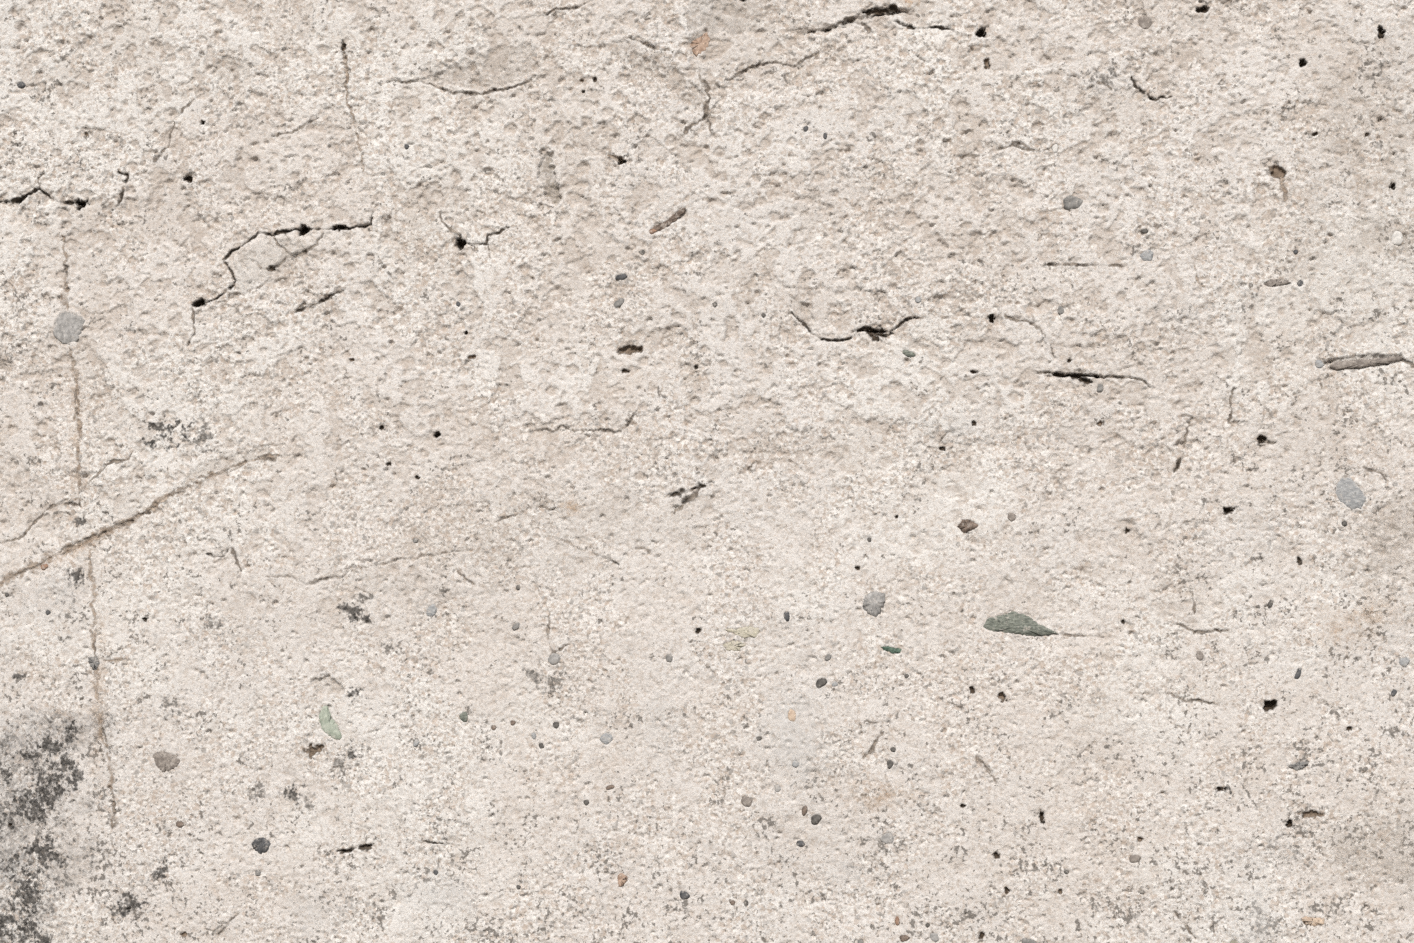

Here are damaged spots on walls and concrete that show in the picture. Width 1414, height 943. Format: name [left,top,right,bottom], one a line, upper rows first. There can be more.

crack [631,4,953,134]
crack [0,102,191,308]
crack [187,215,373,346]
crack [792,312,1147,384]
damp [0,720,83,943]